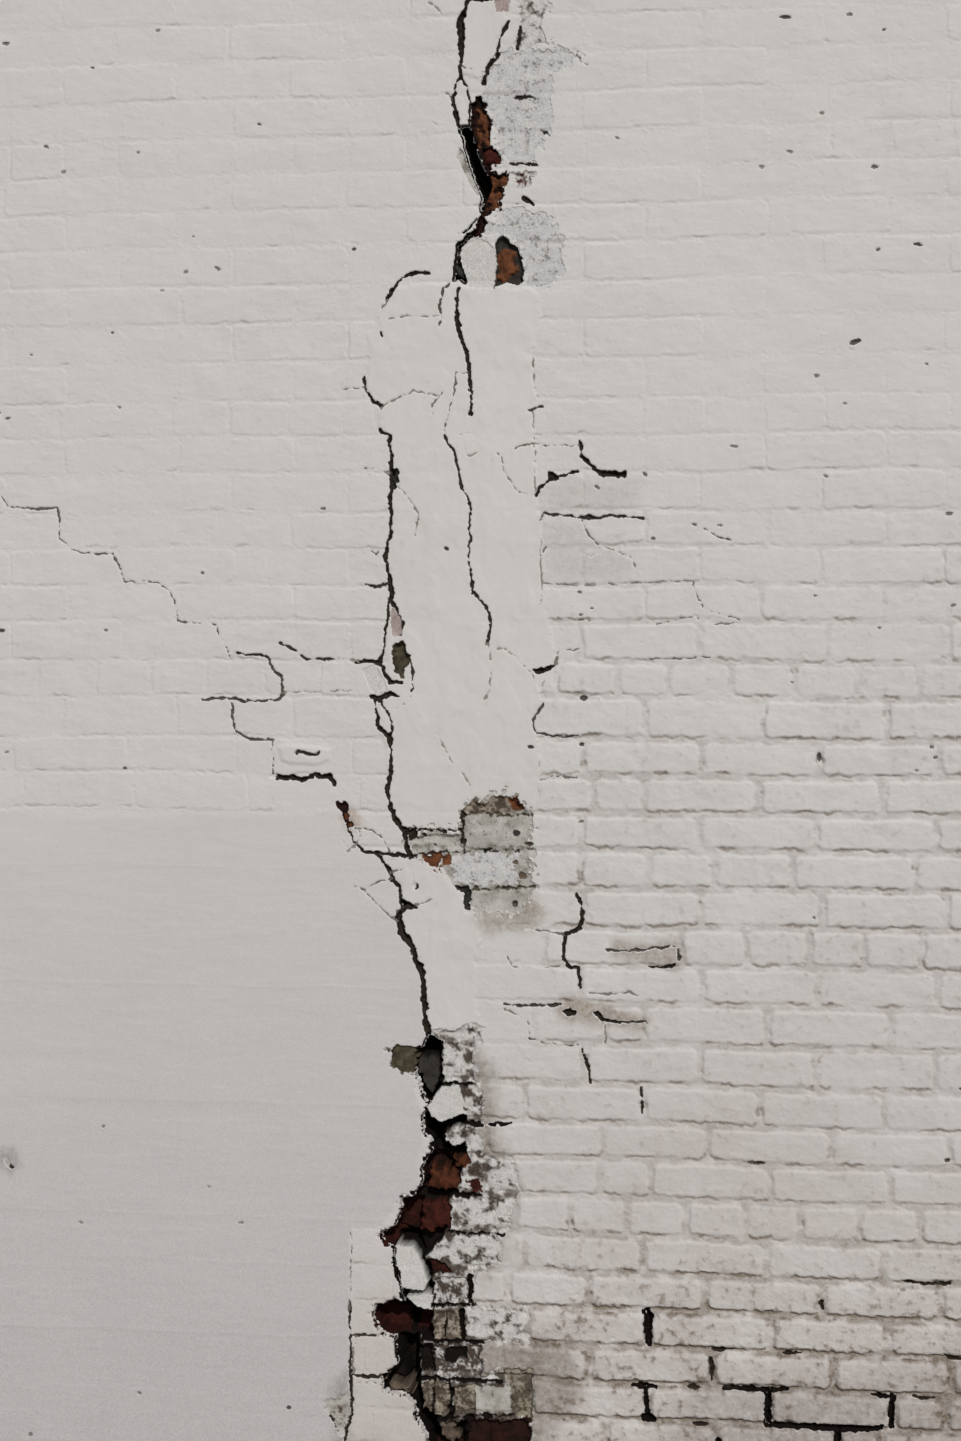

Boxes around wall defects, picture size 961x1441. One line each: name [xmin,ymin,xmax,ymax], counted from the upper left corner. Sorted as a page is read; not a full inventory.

crack [428,0,510,134]
spalling [452,0,579,289]
crack [1,271,740,1037]
spalling [408,786,539,919]
crack [503,892,682,1084]
crack [638,1086,646,1114]
spalling [368,1022,536,1441]
spalling [324,1391,352,1437]
crack [344,1232,400,1441]